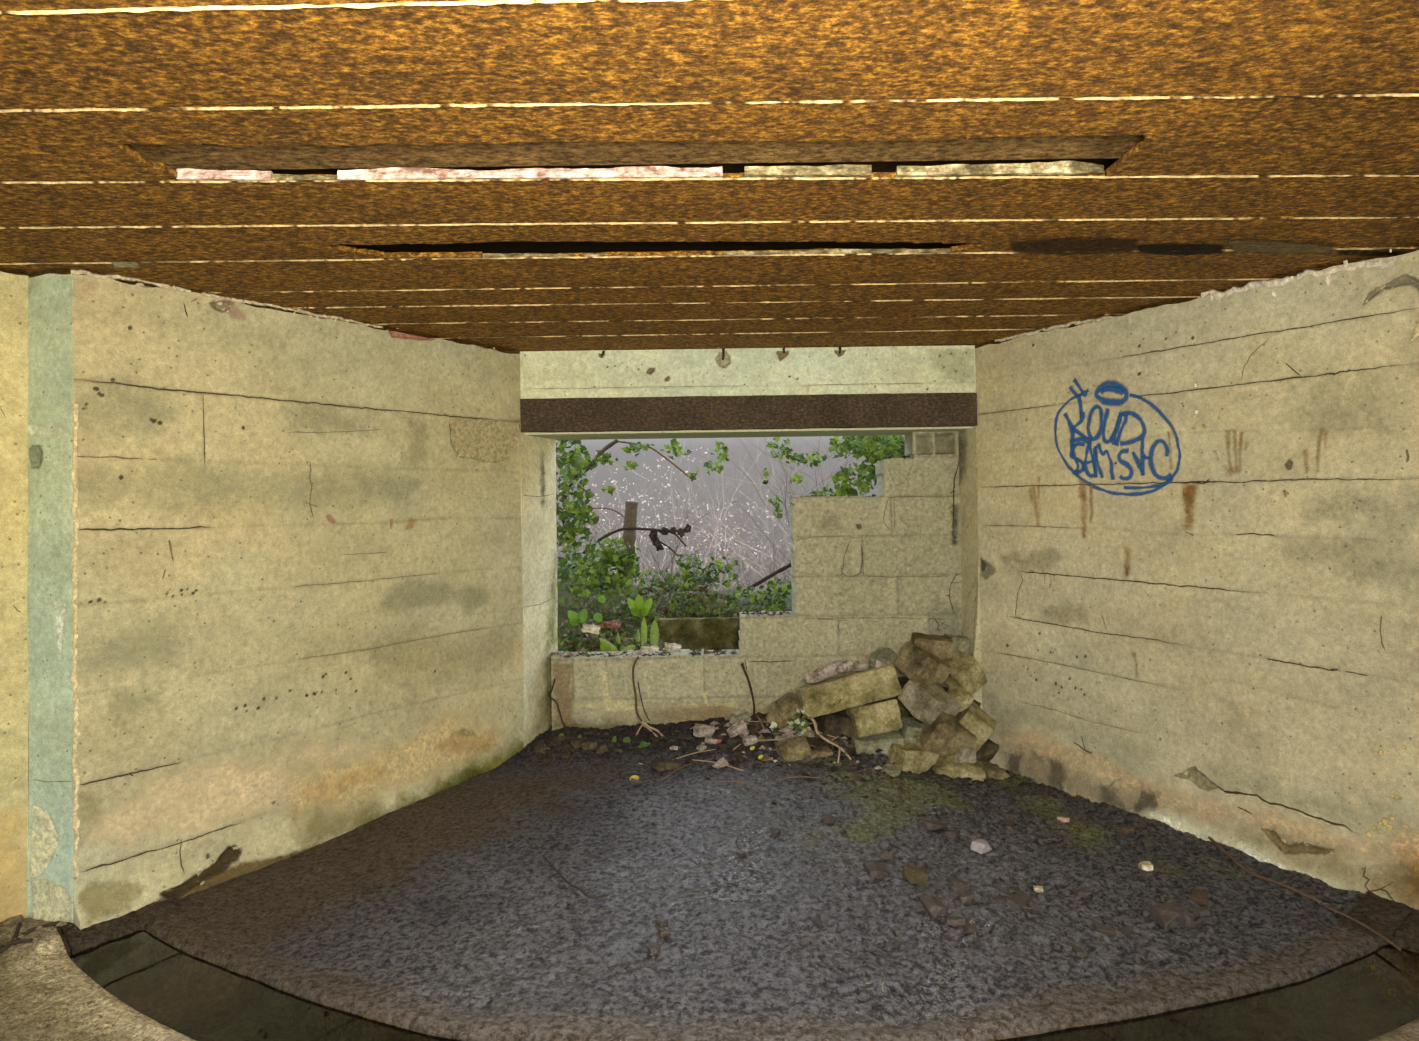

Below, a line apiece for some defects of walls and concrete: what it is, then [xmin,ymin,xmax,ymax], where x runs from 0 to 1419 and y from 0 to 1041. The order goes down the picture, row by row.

peeling [176,166,723,181]
peeling [744,164,872,177]
peeling [896,161,1104,177]
corrosion [1080,482,1092,536]
corrosion [1184,486,1194,528]
spalling [28,378,115,923]
damp [101,718,499,902]
damp [1003,749,1198,838]
crack [1214,783,1395,902]
damp [1238,836,1419,910]
damp [80,884,140,918]